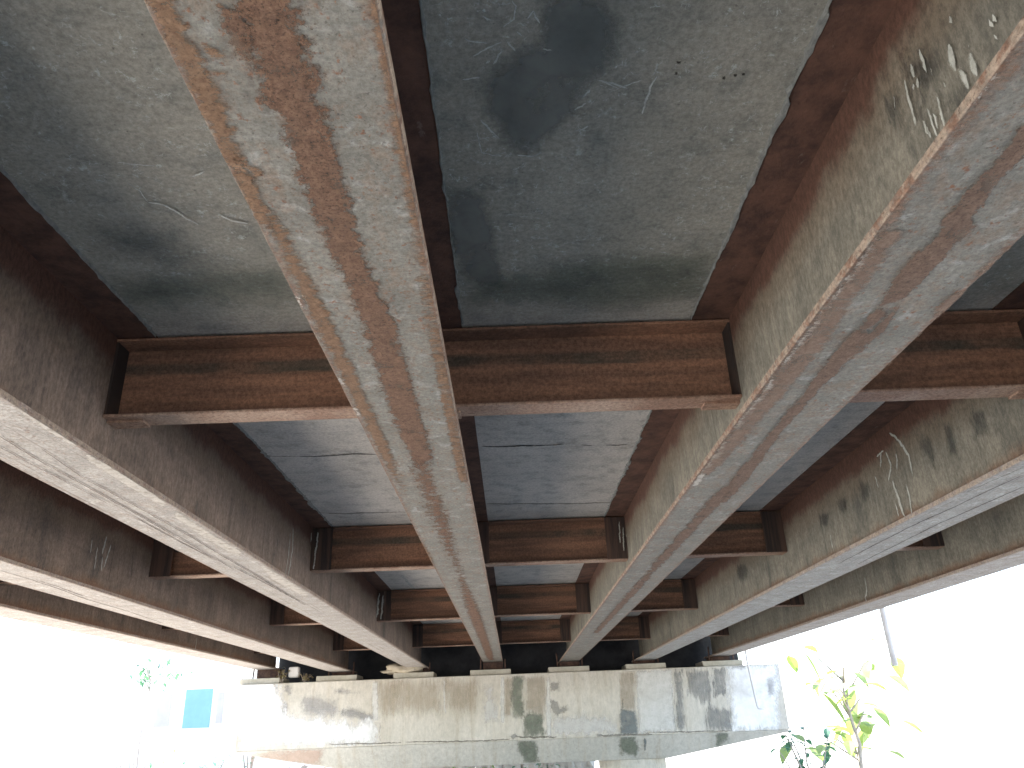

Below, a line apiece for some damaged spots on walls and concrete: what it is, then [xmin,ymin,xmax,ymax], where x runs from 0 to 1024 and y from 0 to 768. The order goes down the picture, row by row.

damp [489,0,612,150]
damp [894,49,946,138]
damp [948,44,977,89]
rust [145,0,495,660]
crack [484,441,627,449]
rust [594,126,1024,633]
rust [1,437,305,605]
damp [485,665,780,763]